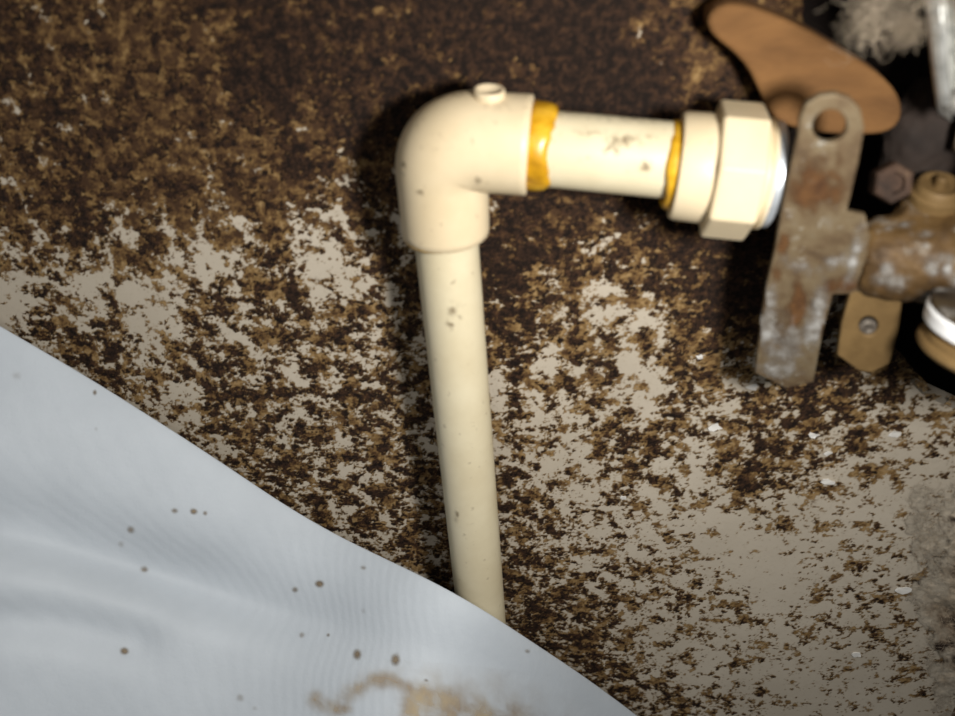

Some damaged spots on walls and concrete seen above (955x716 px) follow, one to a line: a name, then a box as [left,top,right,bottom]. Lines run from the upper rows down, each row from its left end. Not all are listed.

water stain [751,0,804,22]
corrosion [790,166,841,208]
water stain [0,0,795,594]
corrosion [789,284,806,327]
water stain [479,187,955,716]
water stain [372,676,461,716]